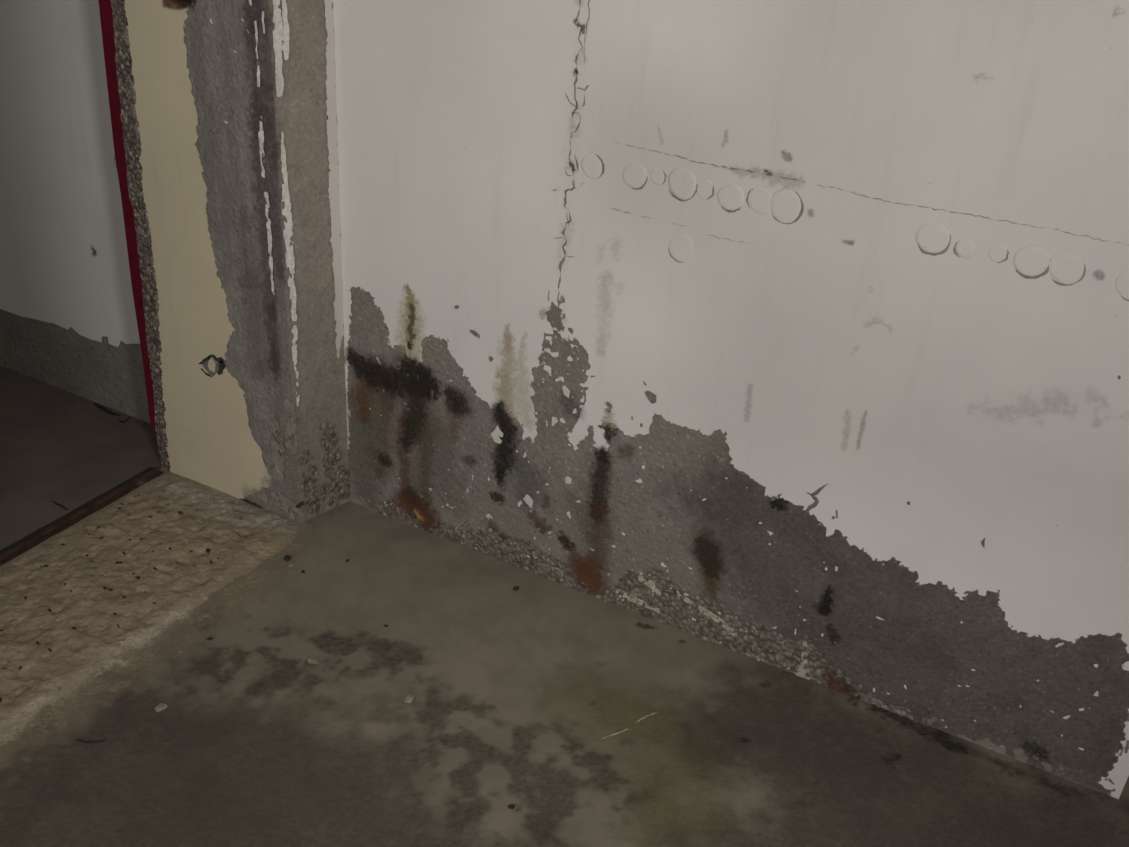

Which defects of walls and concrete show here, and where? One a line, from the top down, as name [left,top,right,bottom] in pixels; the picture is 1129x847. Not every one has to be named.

corrosion [163,0,196,10]
crack [548,0,590,340]
corrosion [346,286,469,530]
corrosion [530,513,602,590]
corrosion [586,402,616,549]
peeling [184,0,1129,796]
corrosion [693,534,722,597]
water stain [0,648,472,847]